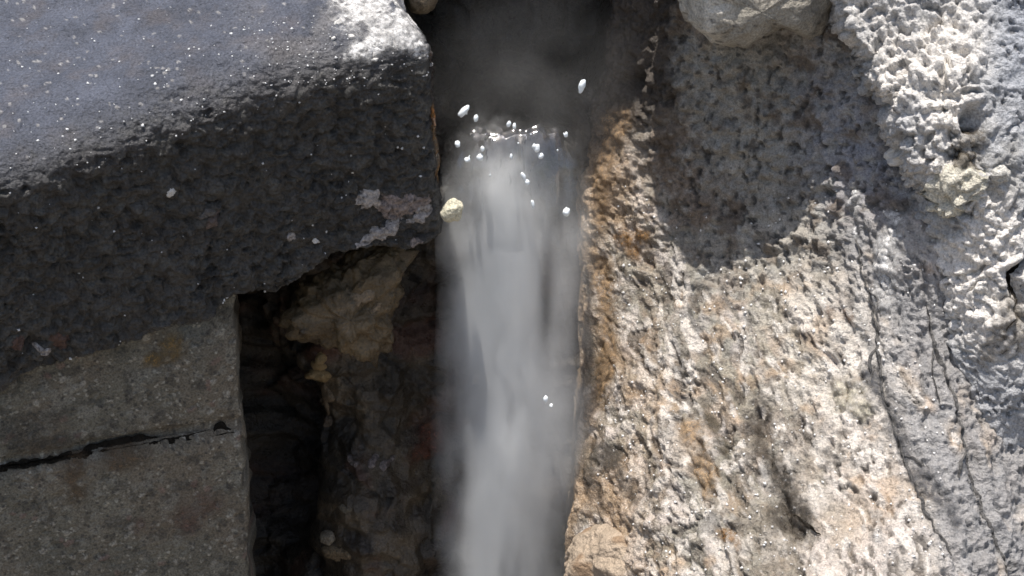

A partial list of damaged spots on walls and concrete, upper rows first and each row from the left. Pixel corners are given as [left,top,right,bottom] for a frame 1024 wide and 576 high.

crack [0,421,234,472]